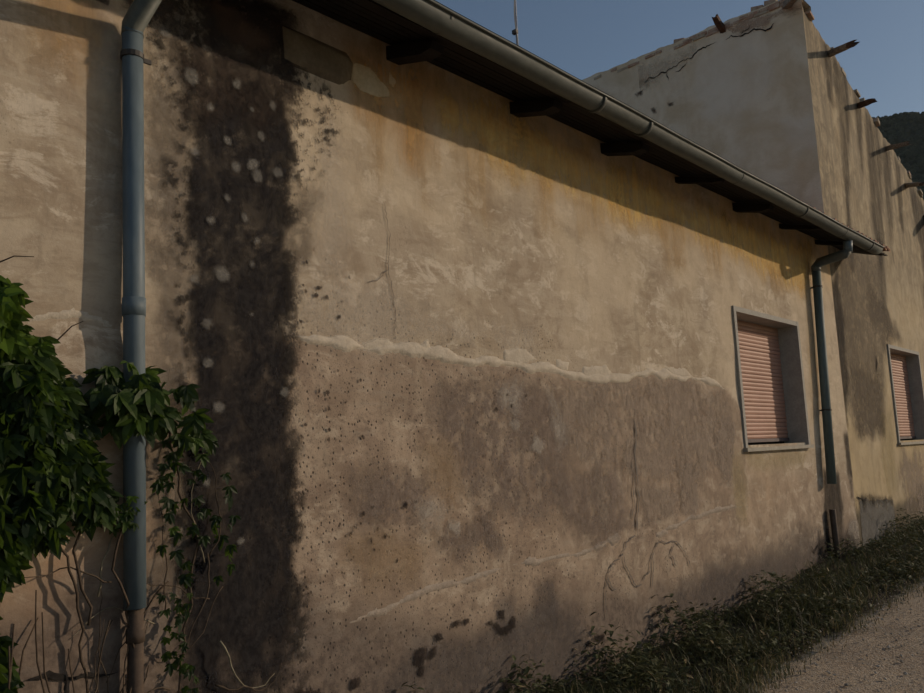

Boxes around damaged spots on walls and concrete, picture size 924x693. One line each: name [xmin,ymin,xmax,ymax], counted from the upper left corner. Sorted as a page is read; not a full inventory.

flaking render [351,61,397,98]
crack [647,23,774,80]
water stain [825,47,924,254]
water stain [147,0,338,693]
water stain [833,253,900,432]
water stain [438,379,735,542]
crack [605,416,691,617]
water stain [819,434,856,563]